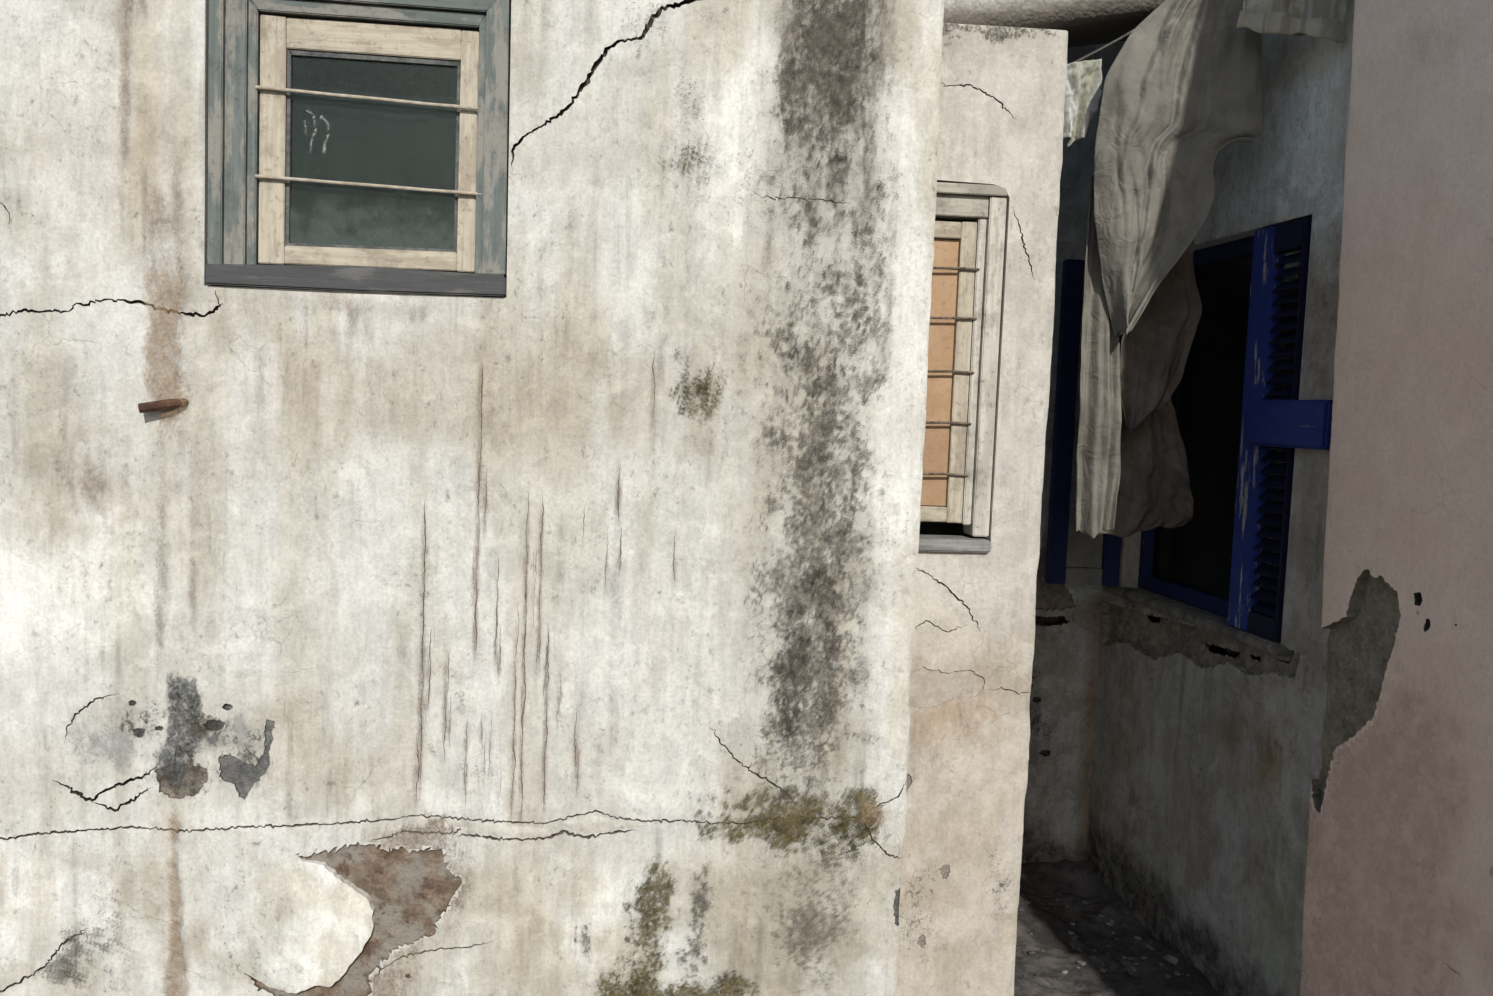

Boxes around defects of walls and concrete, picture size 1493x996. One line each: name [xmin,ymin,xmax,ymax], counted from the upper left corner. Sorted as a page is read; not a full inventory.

crack [511,0,699,171]
crack [0,290,223,317]
rust [143,267,188,433]
damp [734,0,895,795]
spalling [133,726,164,738]
flaking render [154,719,275,800]
crack [0,367,907,859]
crack [916,568,981,632]
flaking render [1102,601,1301,680]
flaking render [1312,569,1401,813]
flaking render [221,842,462,996]
damp [676,863,714,977]